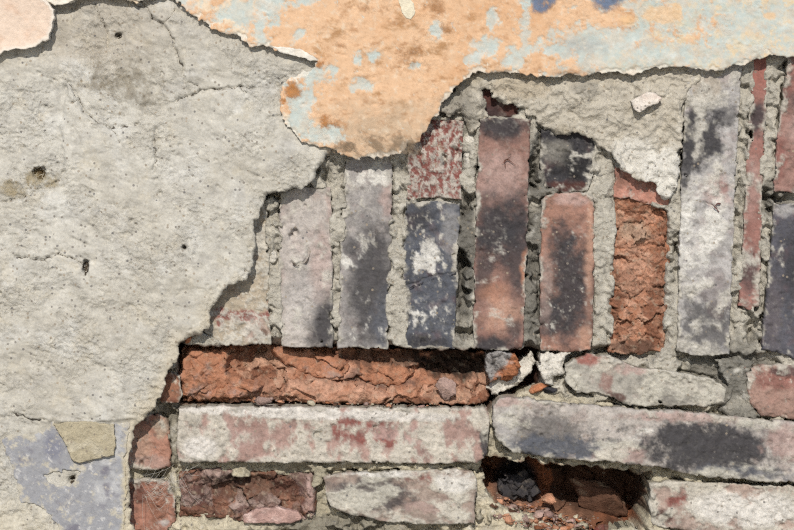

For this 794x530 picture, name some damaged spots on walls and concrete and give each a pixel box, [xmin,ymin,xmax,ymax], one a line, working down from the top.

peeling [0,0,74,55]
crack [138,6,250,102]
peeling [271,46,317,61]
flaking render [631,92,662,112]
spalling [605,197,670,355]
spalling [178,344,490,406]
peeling [2,421,130,530]
spalling [178,467,318,524]